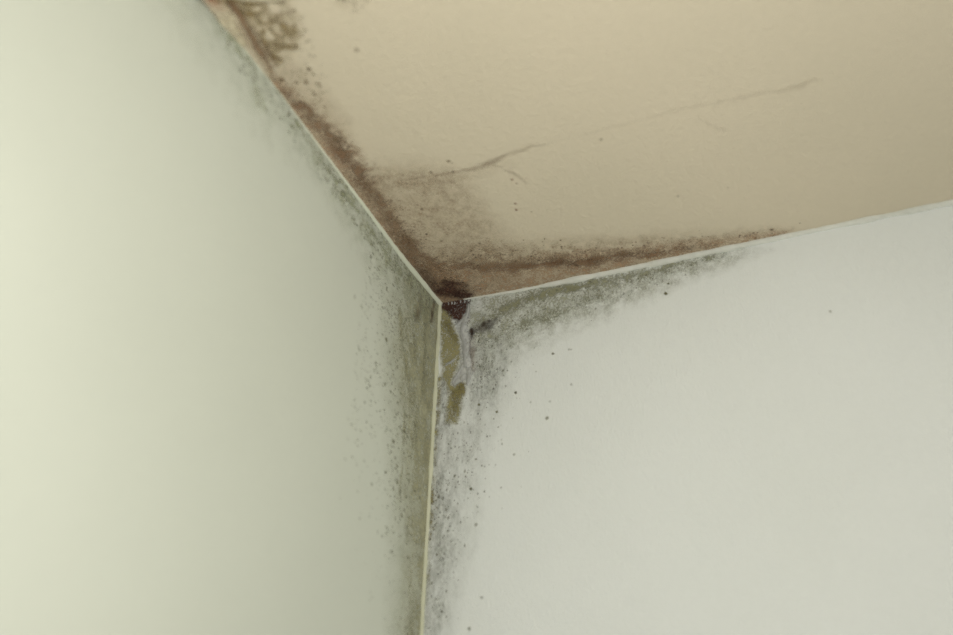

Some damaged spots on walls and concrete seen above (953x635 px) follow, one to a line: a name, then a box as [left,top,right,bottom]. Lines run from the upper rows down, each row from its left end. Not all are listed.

water stain [202,0,296,60]
peeling [445,299,472,386]
water stain [272,68,787,635]